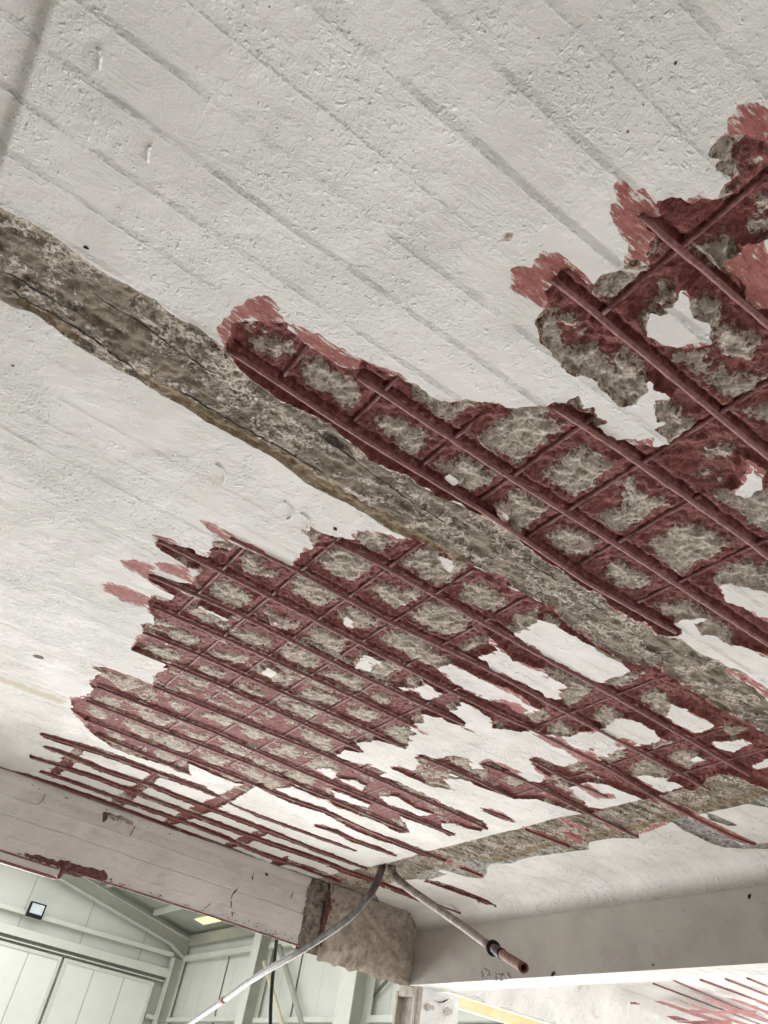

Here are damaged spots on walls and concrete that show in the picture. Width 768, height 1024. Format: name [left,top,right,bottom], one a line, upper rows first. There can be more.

spalling [0,102,768,902]